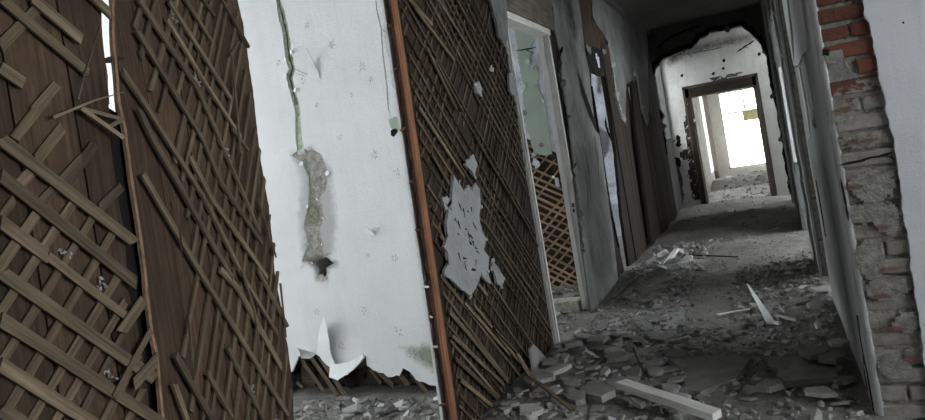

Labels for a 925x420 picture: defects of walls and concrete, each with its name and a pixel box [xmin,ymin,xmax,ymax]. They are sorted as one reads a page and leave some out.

crack [276,0,319,156]
spalling [289,145,330,264]
spalling [387,0,451,420]
peeling [440,154,505,300]
peeling [489,0,557,169]
spalling [651,0,829,277]
spalling [809,0,925,420]
spalling [291,316,429,398]